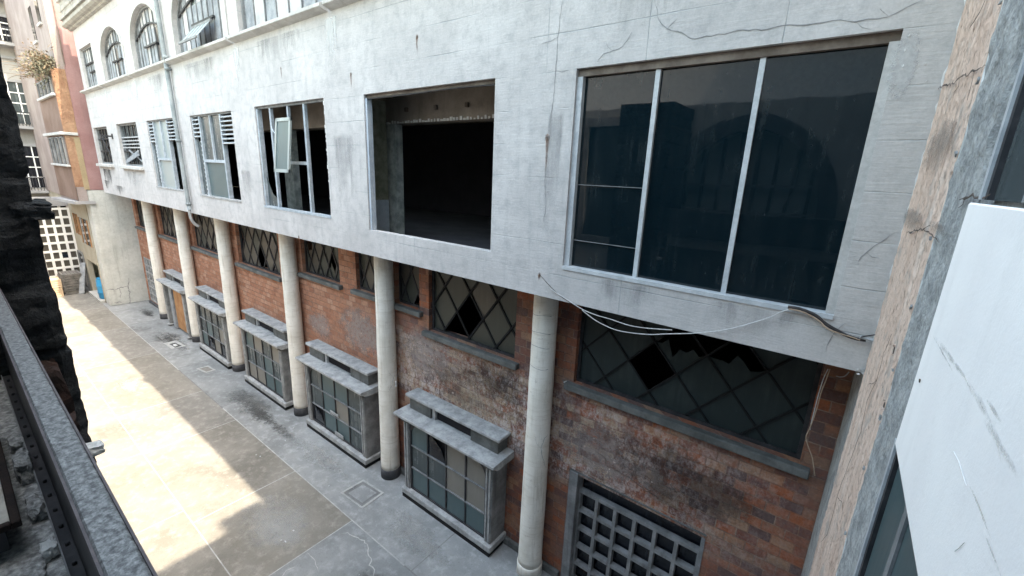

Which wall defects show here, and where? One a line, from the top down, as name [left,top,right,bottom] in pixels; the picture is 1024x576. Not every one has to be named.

crack [655,0,922,39]
crack [938,67,981,100]
crack [858,225,938,262]